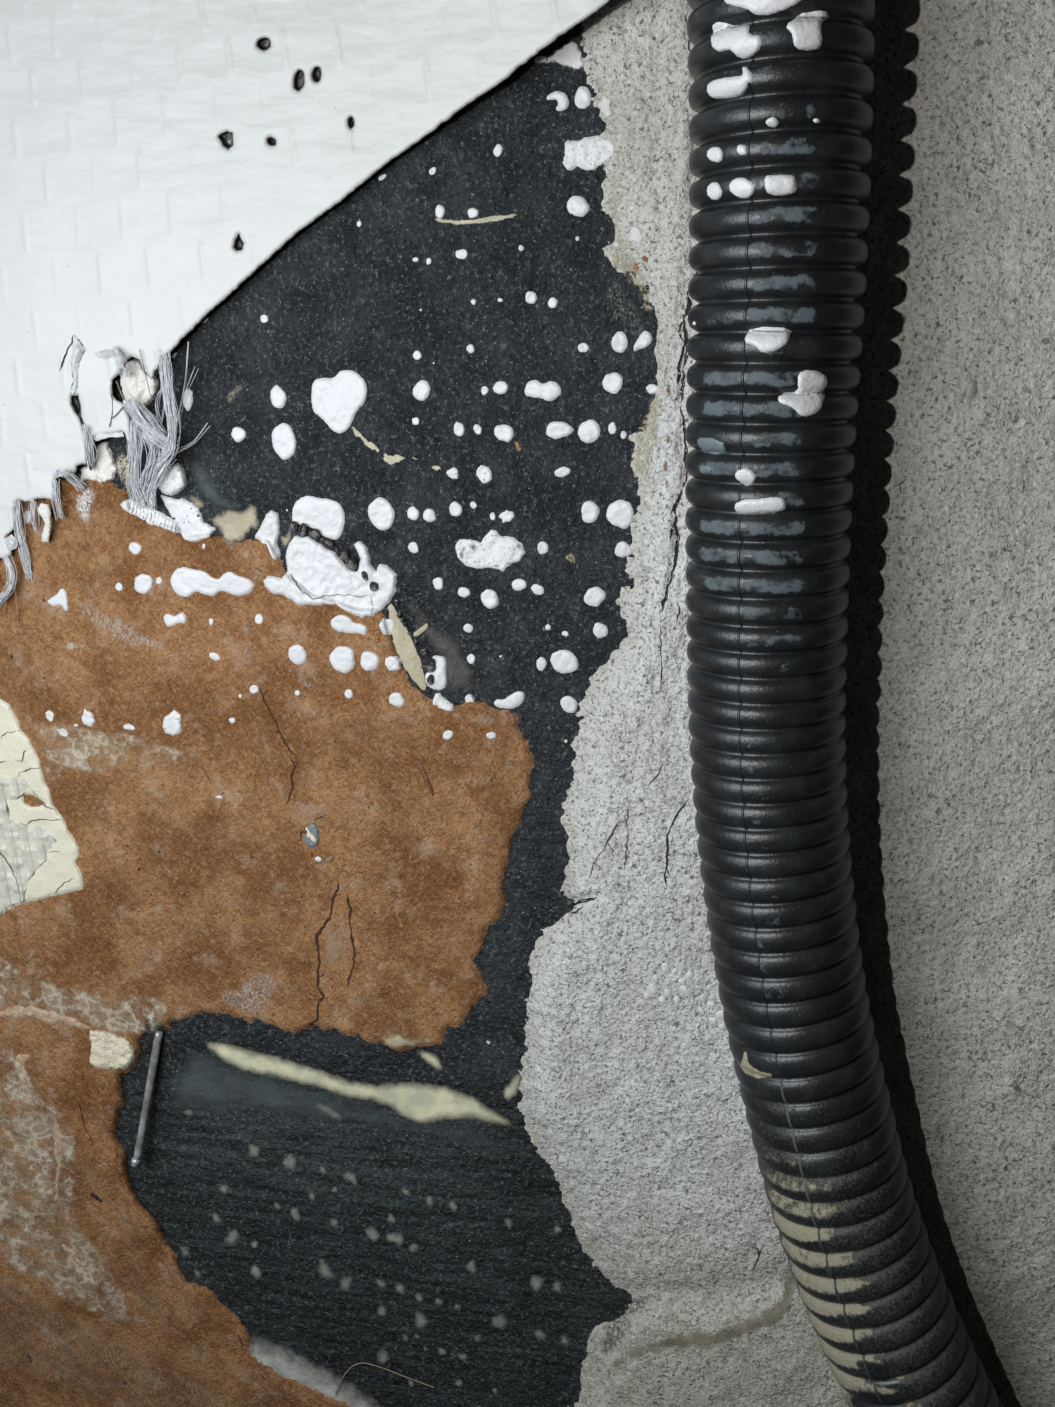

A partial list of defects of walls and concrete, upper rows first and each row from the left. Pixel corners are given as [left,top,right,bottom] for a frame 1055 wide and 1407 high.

crack [659,242,700,691]
peeling [121,495,215,542]
peeling [255,510,435,685]
crack [259,686,355,1028]
peeling [0,1005,91,1030]
peeling [16,1054,31,1093]
peeling [52,1123,65,1201]